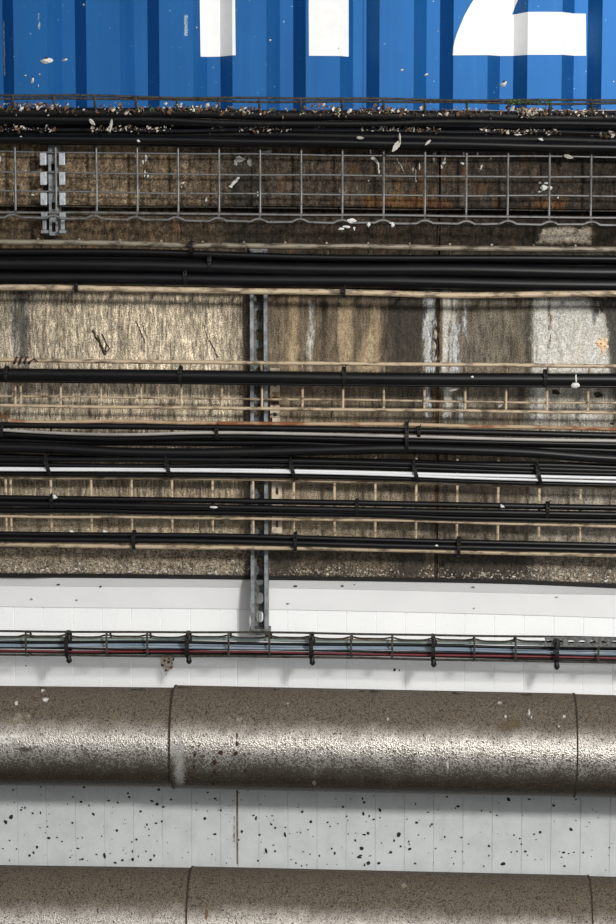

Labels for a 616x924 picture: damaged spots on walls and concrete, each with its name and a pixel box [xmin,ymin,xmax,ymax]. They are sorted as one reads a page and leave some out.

water stain [286,295,326,371]
water stain [337,290,467,373]
water stain [442,387,464,421]